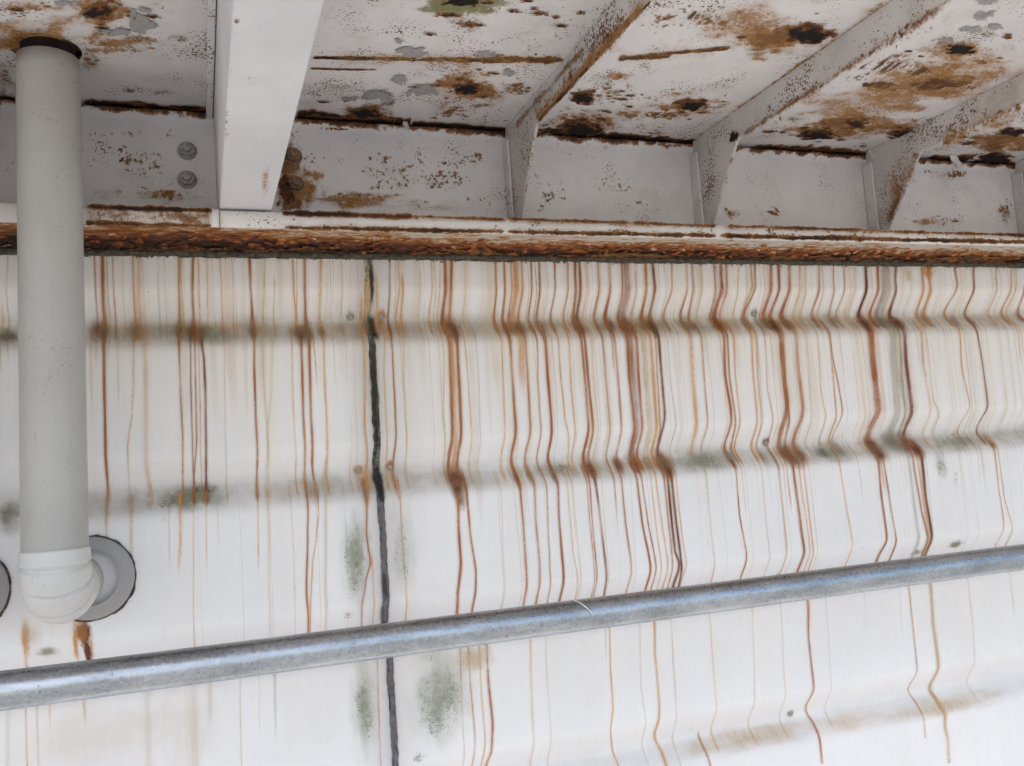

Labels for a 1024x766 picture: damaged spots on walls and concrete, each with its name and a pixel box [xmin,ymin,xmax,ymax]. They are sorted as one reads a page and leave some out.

corrosion [0,0,164,93]
corrosion [412,0,838,137]
corrosion [263,102,1024,244]
corrosion [728,2,1010,148]
corrosion [94,256,117,506]
corrosion [177,257,208,512]
corrosion [292,258,328,633]
corrosion [428,260,477,614]
corrosion [493,261,708,606]
corrosion [710,263,816,572]
corrosion [857,266,1010,562]
corrosion [73,622,92,660]